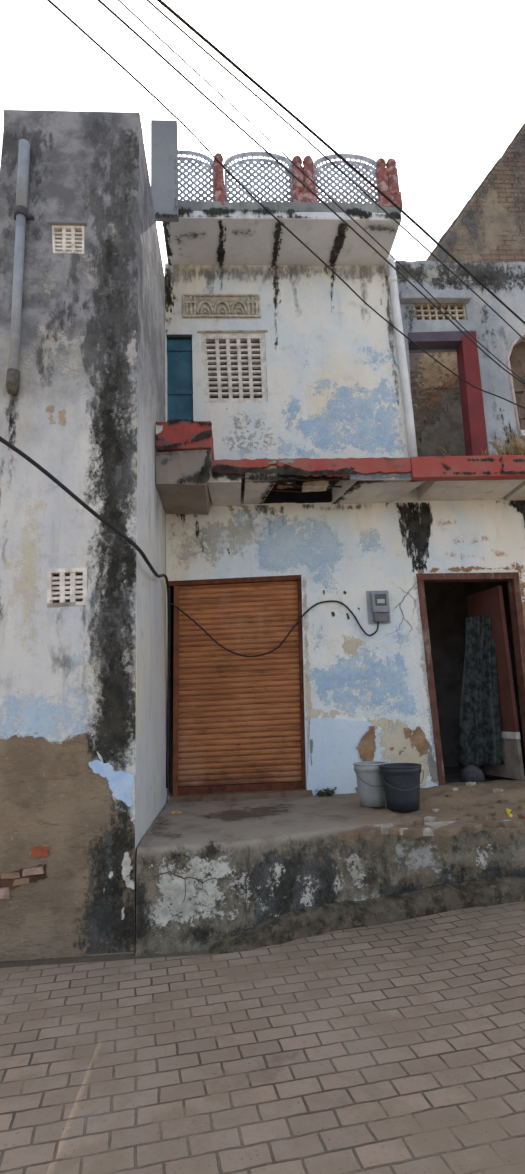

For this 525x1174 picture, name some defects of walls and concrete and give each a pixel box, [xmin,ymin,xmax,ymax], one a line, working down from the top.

leakage [1,128,52,216]
peeling [125,331,137,366]
leakage [163,198,402,405]
leakage [37,118,136,771]
peeling [156,419,212,450]
peeling [212,347,411,493]
leakage [413,352,525,475]
leakage [386,502,433,574]
leakage [496,500,525,526]
peeling [235,510,525,787]
peeling [0,688,319,962]
peeling [333,853,380,901]